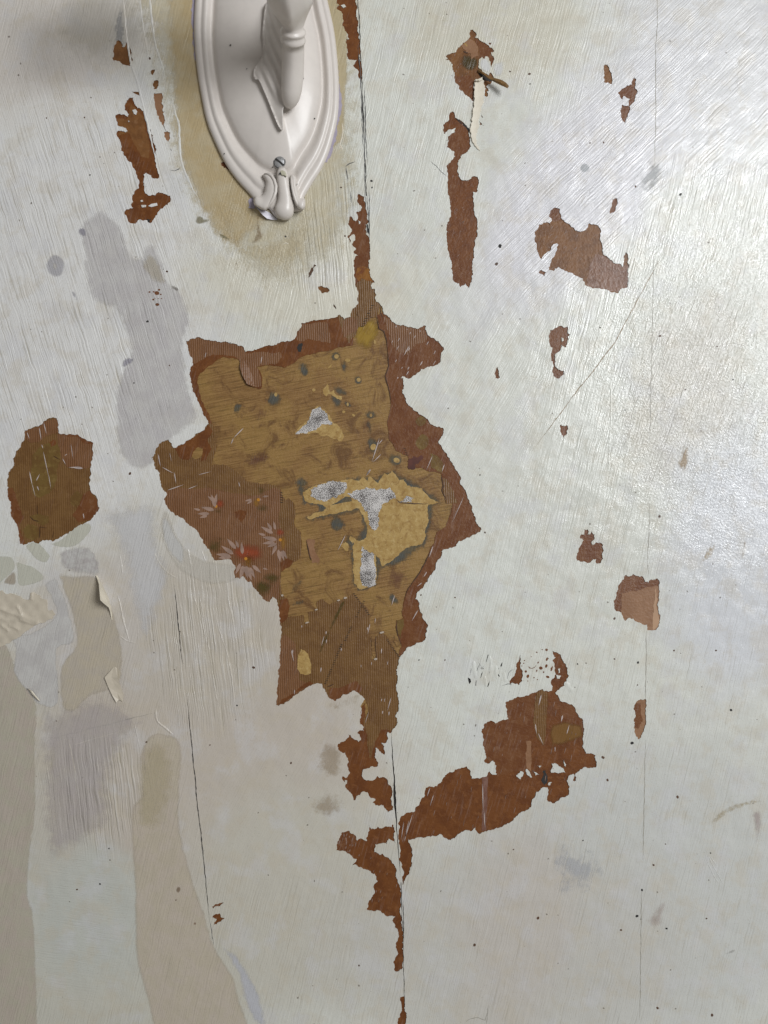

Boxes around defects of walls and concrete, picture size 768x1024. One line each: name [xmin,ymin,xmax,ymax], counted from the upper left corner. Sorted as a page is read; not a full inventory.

damp [83,214,194,466]
peeling [115,57,172,224]
damp [141,0,355,278]
crack [357,0,370,240]
peeling [443,30,509,288]
peeling [534,208,629,293]
peeling [604,65,637,122]
peeling [0,417,99,647]
peeling [152,194,597,971]
peeling [614,574,660,630]
crack [187,702,214,945]
crack [391,740,405,999]